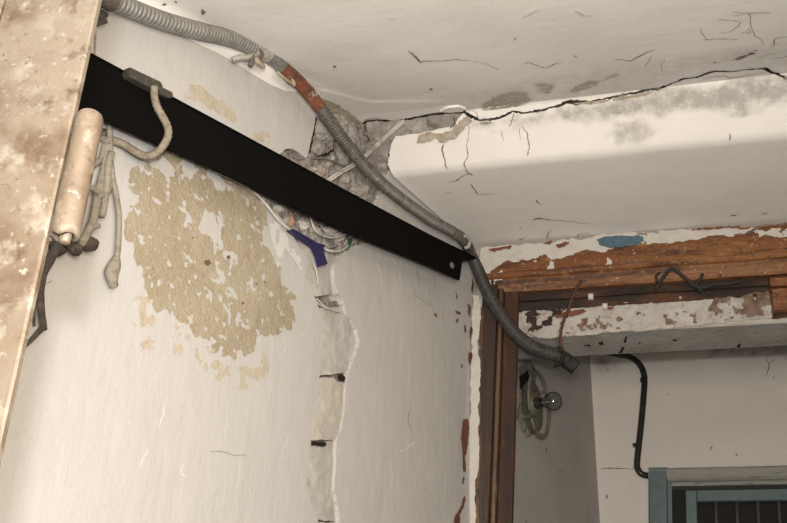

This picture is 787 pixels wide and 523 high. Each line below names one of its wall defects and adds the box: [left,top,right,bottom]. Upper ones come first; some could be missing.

spalling [280,116,378,205]
peeling [321,91,492,175]
crack [362,12,787,195]
peeling [124,149,367,389]
peeling [305,306,356,523]
peeling [454,278,484,523]
peeling [479,222,787,285]
spalling [519,290,787,347]